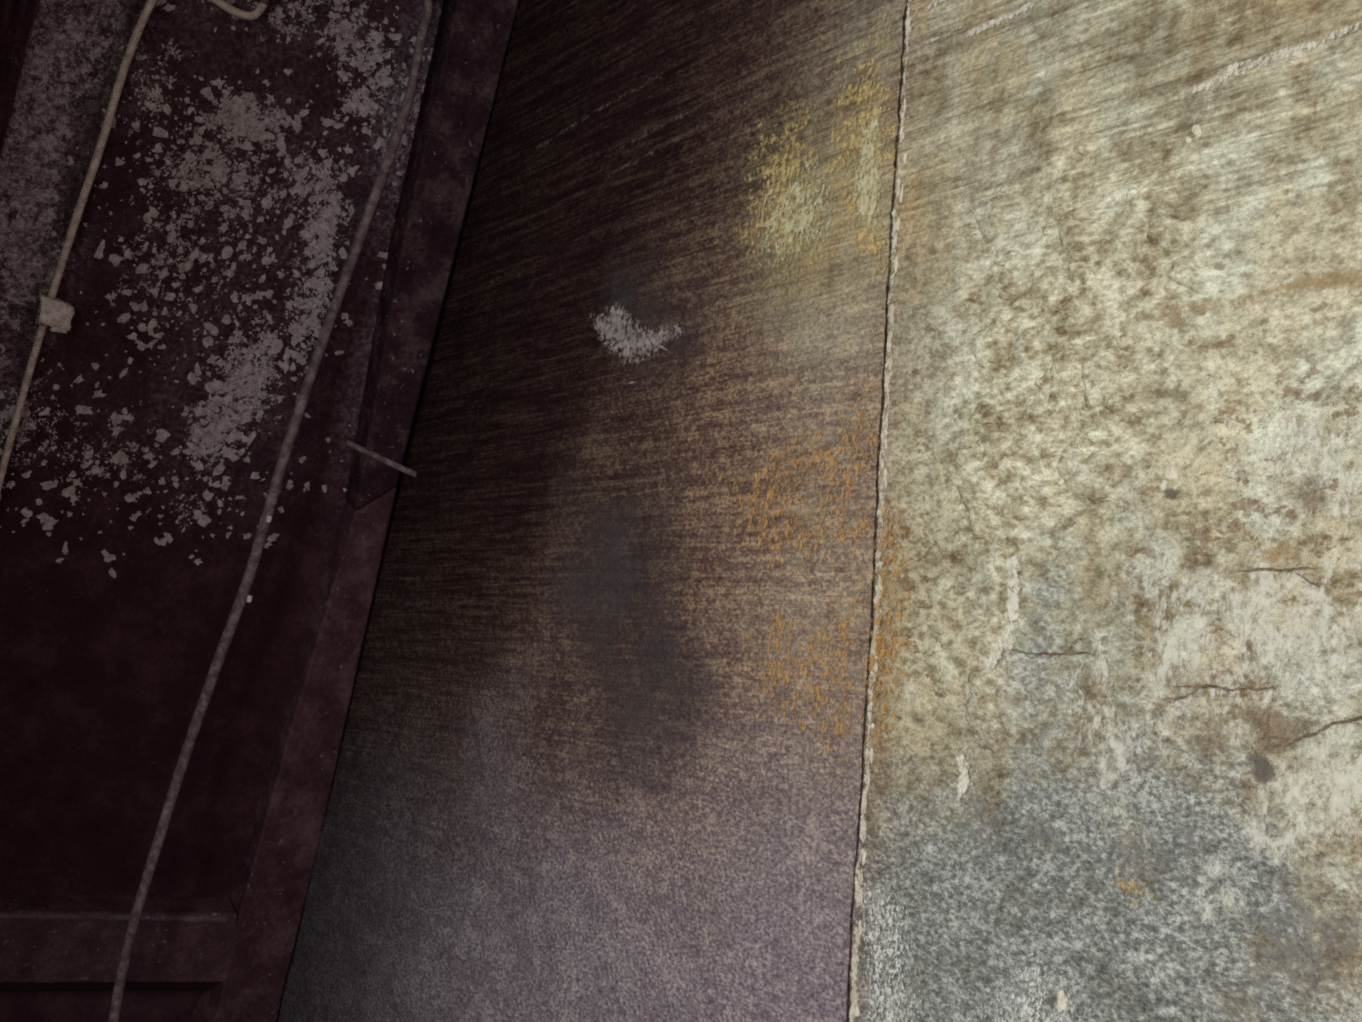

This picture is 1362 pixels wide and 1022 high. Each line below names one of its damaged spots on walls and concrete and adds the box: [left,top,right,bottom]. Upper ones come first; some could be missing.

rust [736,14,898,281]
rust [715,378,877,576]
rust [743,495,915,760]
crack [1165,684,1280,700]
crack [1255,716,1362,751]